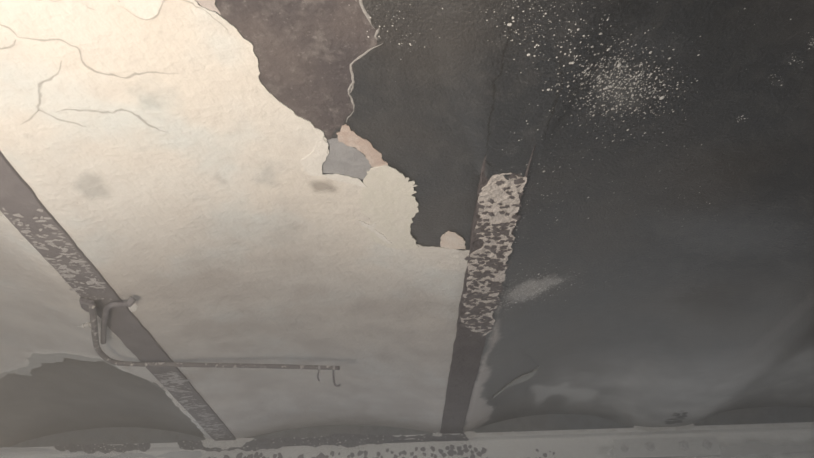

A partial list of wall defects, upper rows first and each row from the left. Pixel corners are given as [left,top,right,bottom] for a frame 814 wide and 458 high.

water stain [481,0,698,160]
peeling [0,0,544,441]
water stain [500,255,580,310]